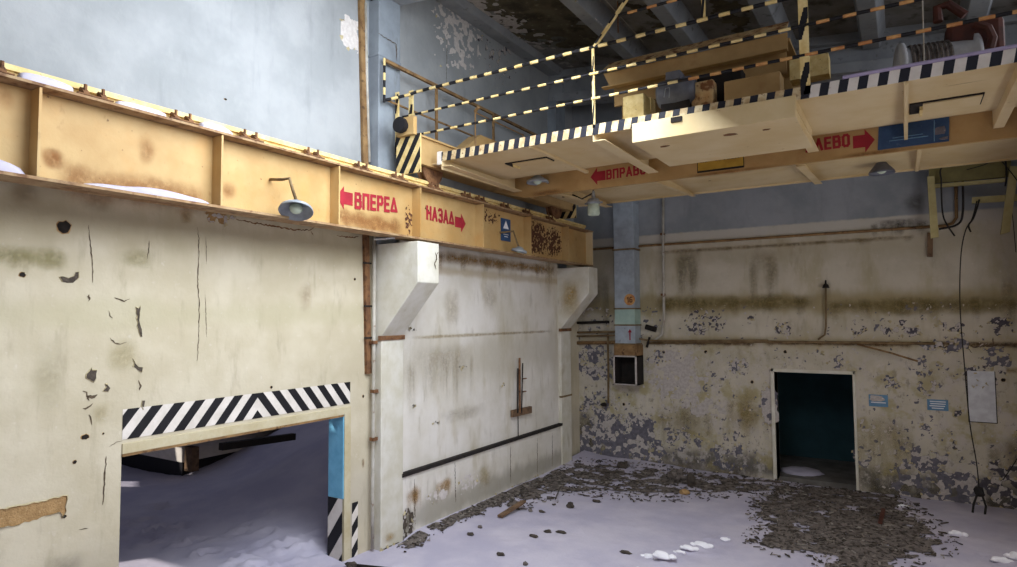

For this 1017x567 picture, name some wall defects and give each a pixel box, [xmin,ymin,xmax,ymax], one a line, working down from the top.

peeling [340,14,359,54]
peeling [431,4,516,84]
crack [87,225,129,344]
crack [197,228,207,360]
corrosion [447,221,562,272]
damp [665,297,800,308]
damp [841,300,1001,312]
peeling [578,305,779,474]
peeling [765,302,1017,510]
spalling [0,495,68,528]